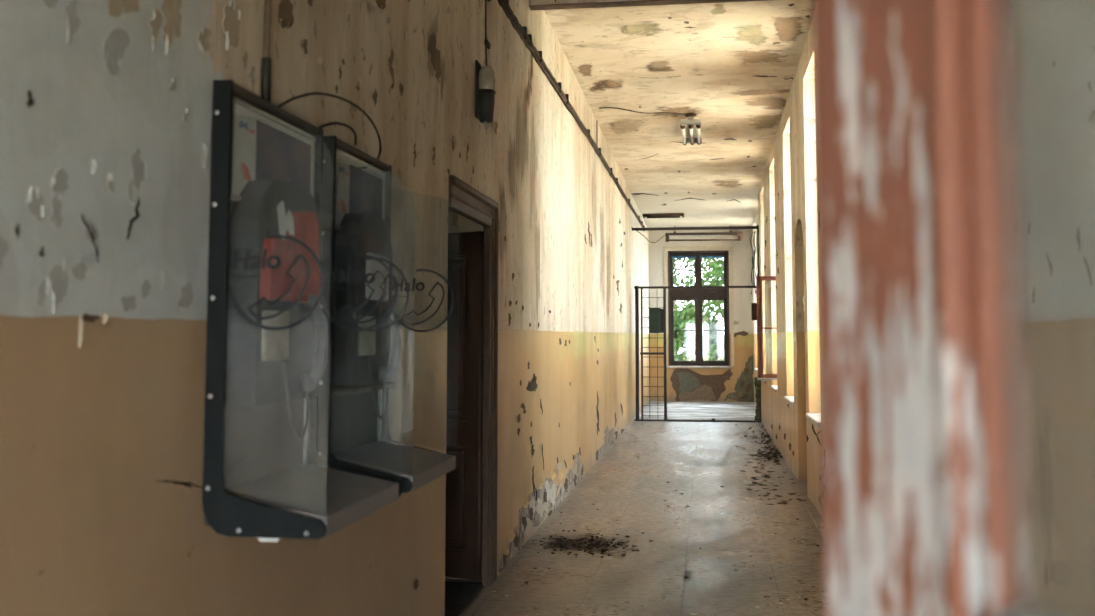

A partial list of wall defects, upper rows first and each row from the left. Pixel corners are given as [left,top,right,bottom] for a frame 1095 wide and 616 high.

peeling [103,0,182,76]
leakage [775,17,804,41]
leakage [578,65,621,91]
leakage [647,61,674,72]
leakage [735,50,785,64]
leakage [652,107,699,117]
leakage [736,89,790,109]
peeling [126,148,146,240]
peeling [37,214,99,313]
flaking render [670,355,754,402]
crack [157,480,203,488]
flaking render [497,453,584,576]